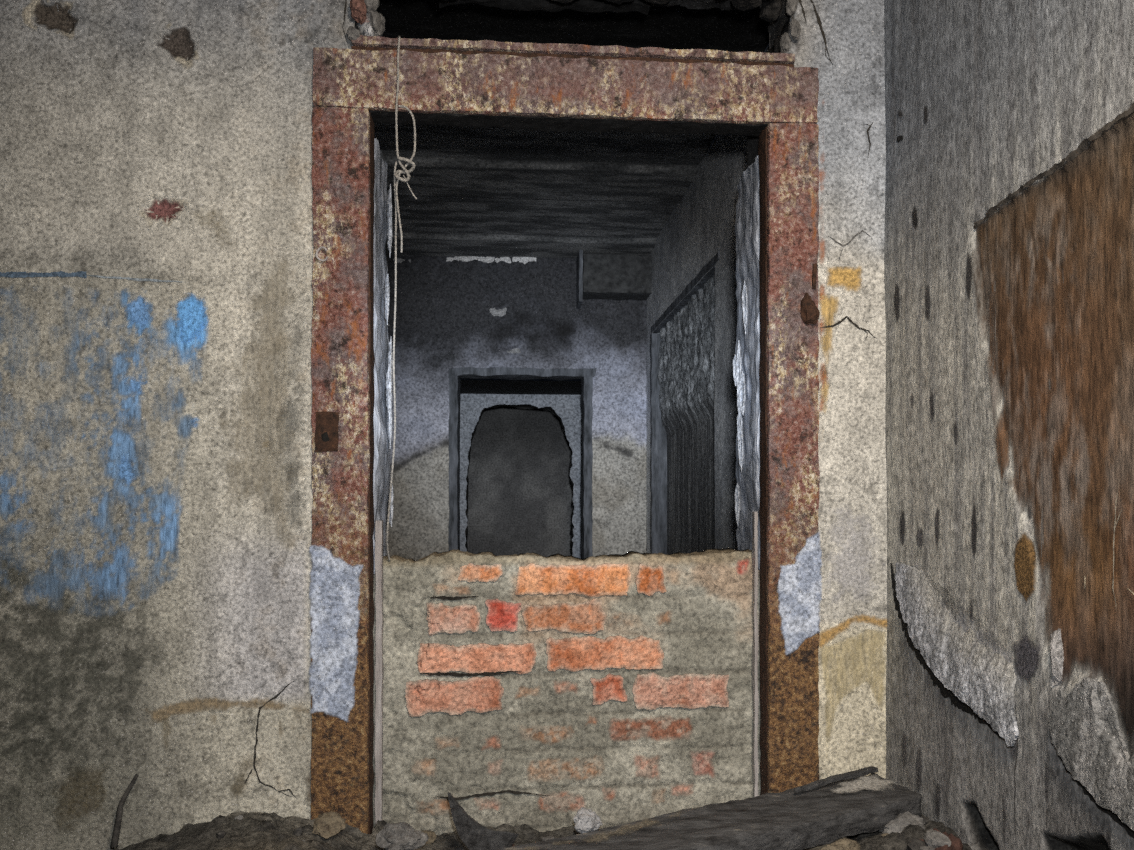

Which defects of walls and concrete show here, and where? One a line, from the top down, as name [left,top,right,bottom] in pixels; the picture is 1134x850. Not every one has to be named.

spalling [22,0,78,38]
crack [798,0,833,65]
peeling [0,271,179,334]
peeling [166,295,207,360]
peeling [172,392,197,437]
peeling [37,349,179,596]
peeling [966,103,1134,850]
corrosion [1014,534,1036,601]
peeling [890,563,1019,758]
crack [244,681,294,797]
spalling [902,733,921,790]